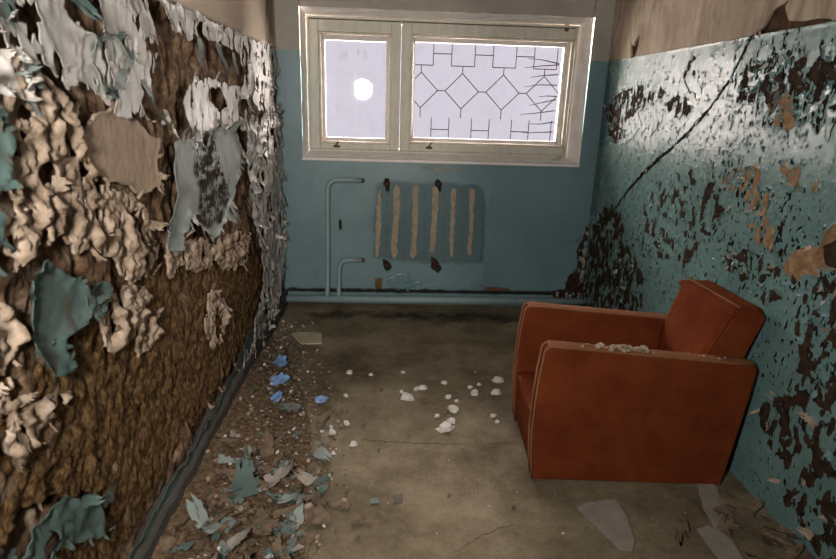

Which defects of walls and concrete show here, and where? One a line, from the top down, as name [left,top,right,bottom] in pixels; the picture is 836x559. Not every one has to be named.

spalling [734,4,834,44]
peeling [603,84,691,144]
crack [604,21,770,226]
peeling [736,49,836,131]
peeling [551,203,644,311]
peeling [642,159,836,559]
peeling [189,415,332,559]
peeling [288,403,333,463]